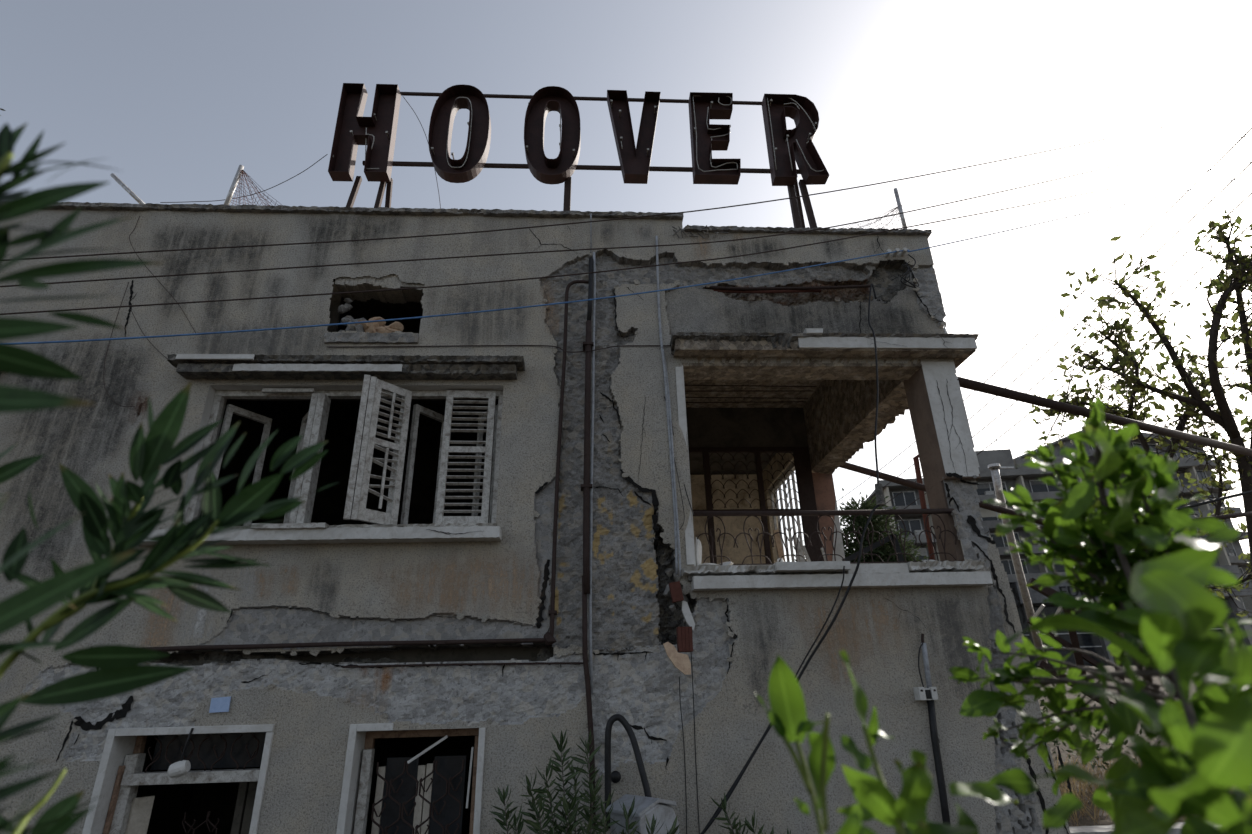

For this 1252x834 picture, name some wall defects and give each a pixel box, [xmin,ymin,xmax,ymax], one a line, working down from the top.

spalling [57,246,946,776]
crack [936,379,1025,633]
spalling [22,663,97,695]
crack [56,696,133,761]
crack [151,559,653,683]
crack [1026,743,1072,834]